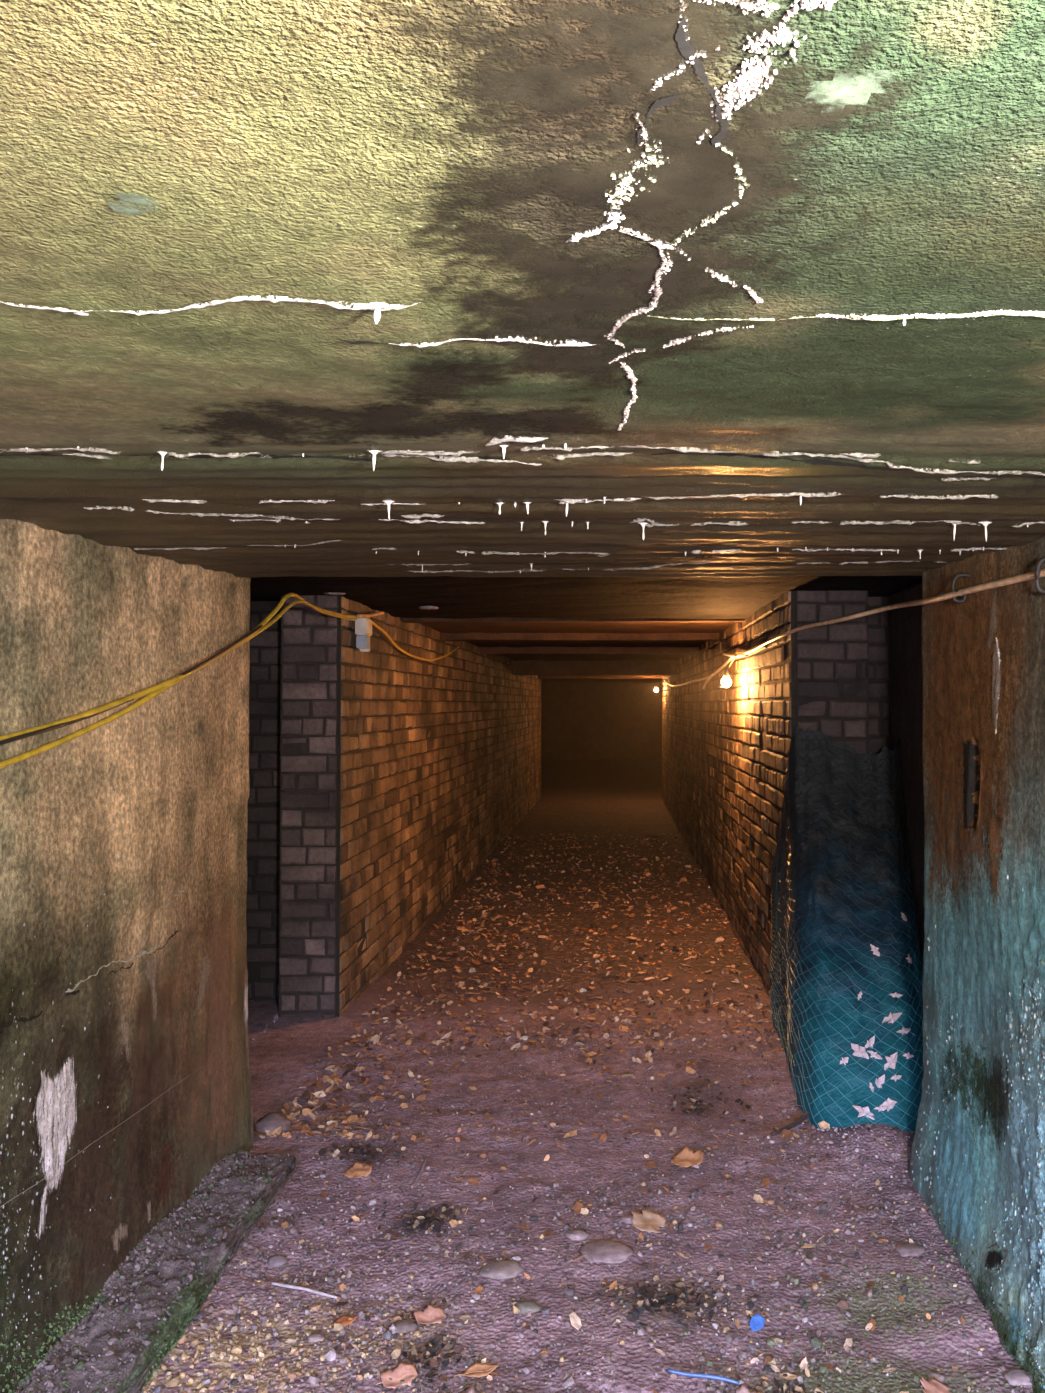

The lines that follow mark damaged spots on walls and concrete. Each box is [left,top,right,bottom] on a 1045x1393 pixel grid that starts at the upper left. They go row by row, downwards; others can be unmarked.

crack [0,0,1045,574]
leakage [163,0,906,447]
leakage [0,990,115,1388]
leakage [911,864,1045,1389]